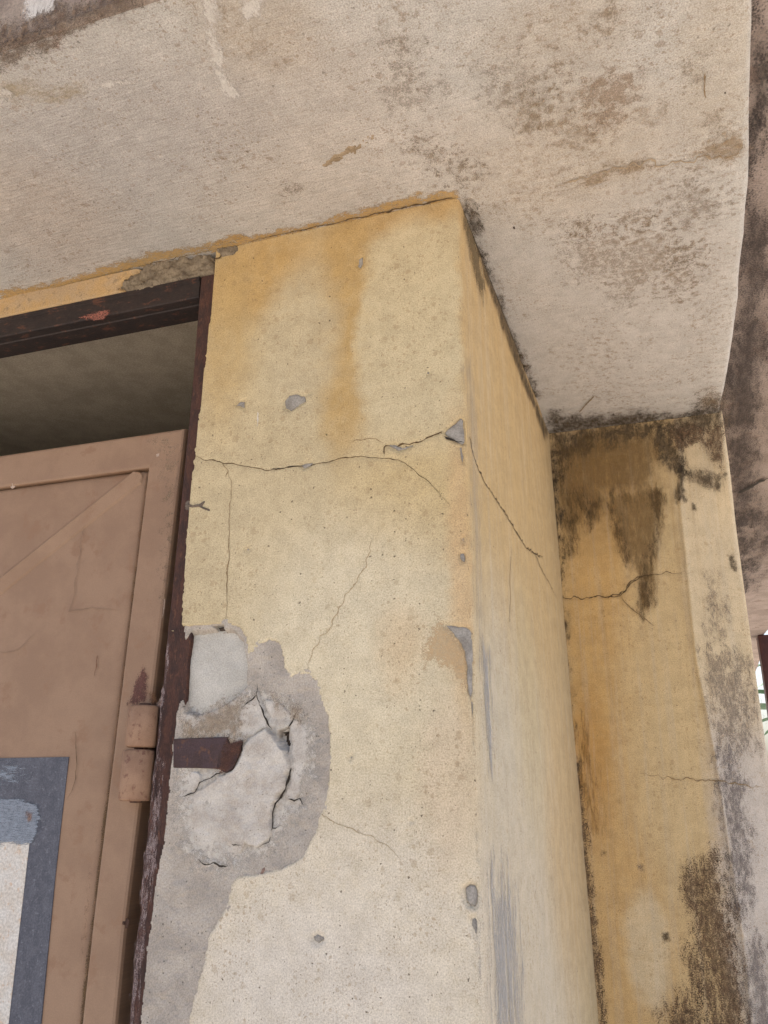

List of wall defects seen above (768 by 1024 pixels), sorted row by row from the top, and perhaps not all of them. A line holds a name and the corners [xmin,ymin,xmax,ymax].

spalling [121,255,215,292]
leakage [460,0,768,622]
crack [197,431,449,611]
crack [307,543,371,665]
crack [469,437,689,626]
spalling [122,619,331,1024]
corrosion [216,739,243,775]
leakage [653,570,768,1024]